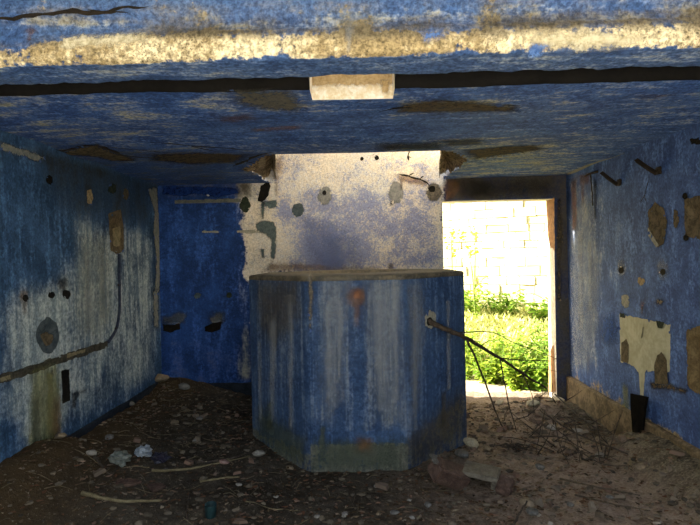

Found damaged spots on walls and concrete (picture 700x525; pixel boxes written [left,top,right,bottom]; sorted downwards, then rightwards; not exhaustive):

crack [0,6,149,21]
spalling [108,209,124,255]
peeling [148,152,278,333]
peeling [292,203,304,217]
spalling [317,187,332,205]
spalling [389,182,403,205]
spalling [425,145,541,201]
spalling [648,193,700,247]
spalling [0,317,108,404]
peeling [617,294,700,396]
leakage [29,367,58,443]